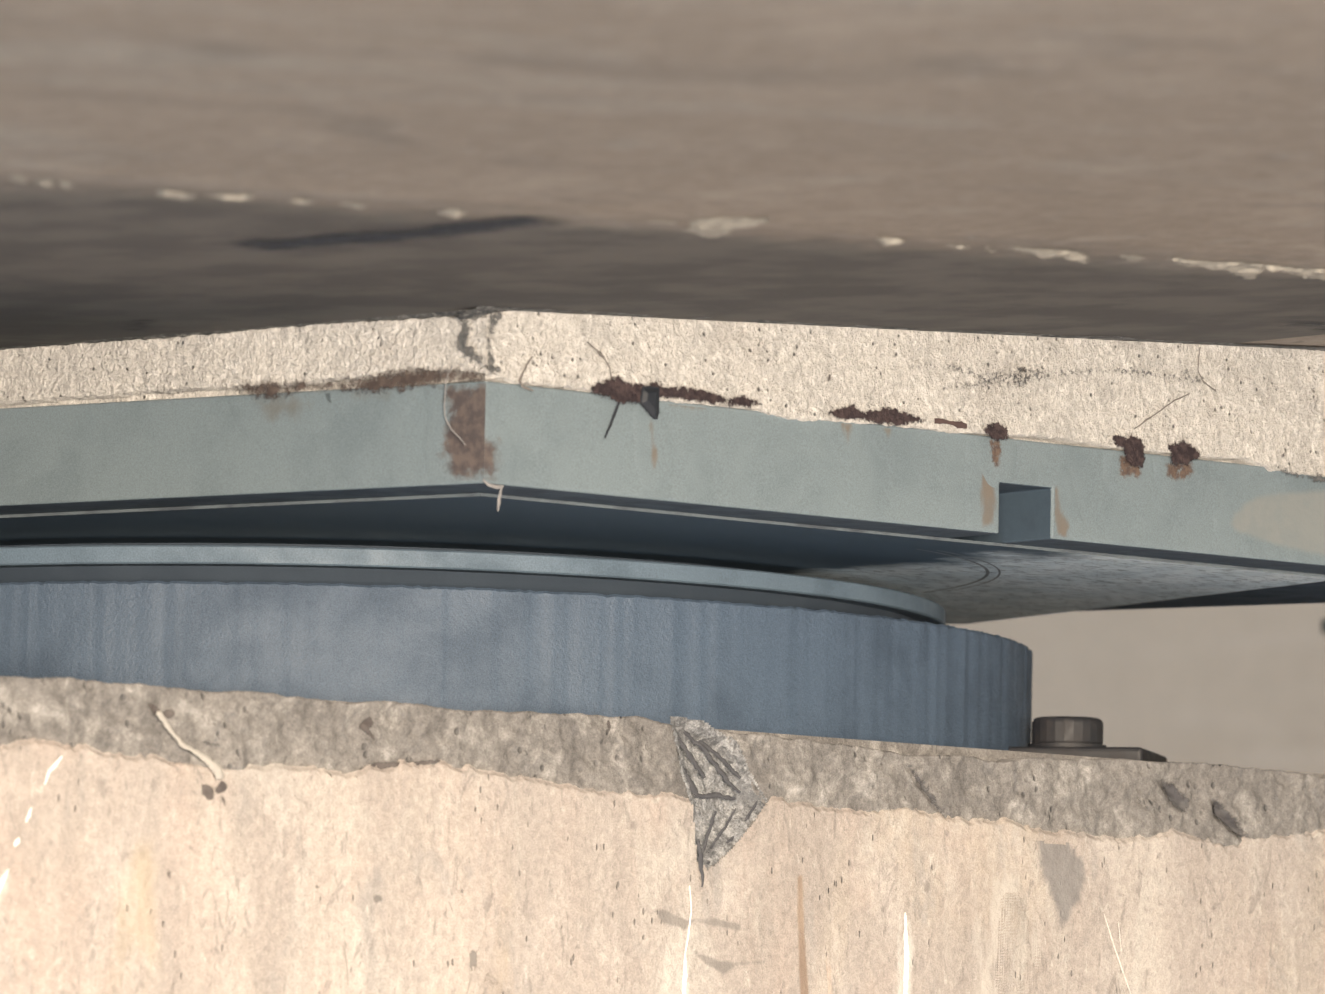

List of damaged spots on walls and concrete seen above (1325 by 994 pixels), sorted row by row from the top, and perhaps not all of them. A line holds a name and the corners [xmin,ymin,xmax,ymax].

rust [227,369,518,482]
rust [591,375,762,491]
rust [822,404,1017,530]
rust [1102,433,1210,517]
crack [0,755,63,939]
spalling [670,716,767,887]
crack [663,862,708,994]